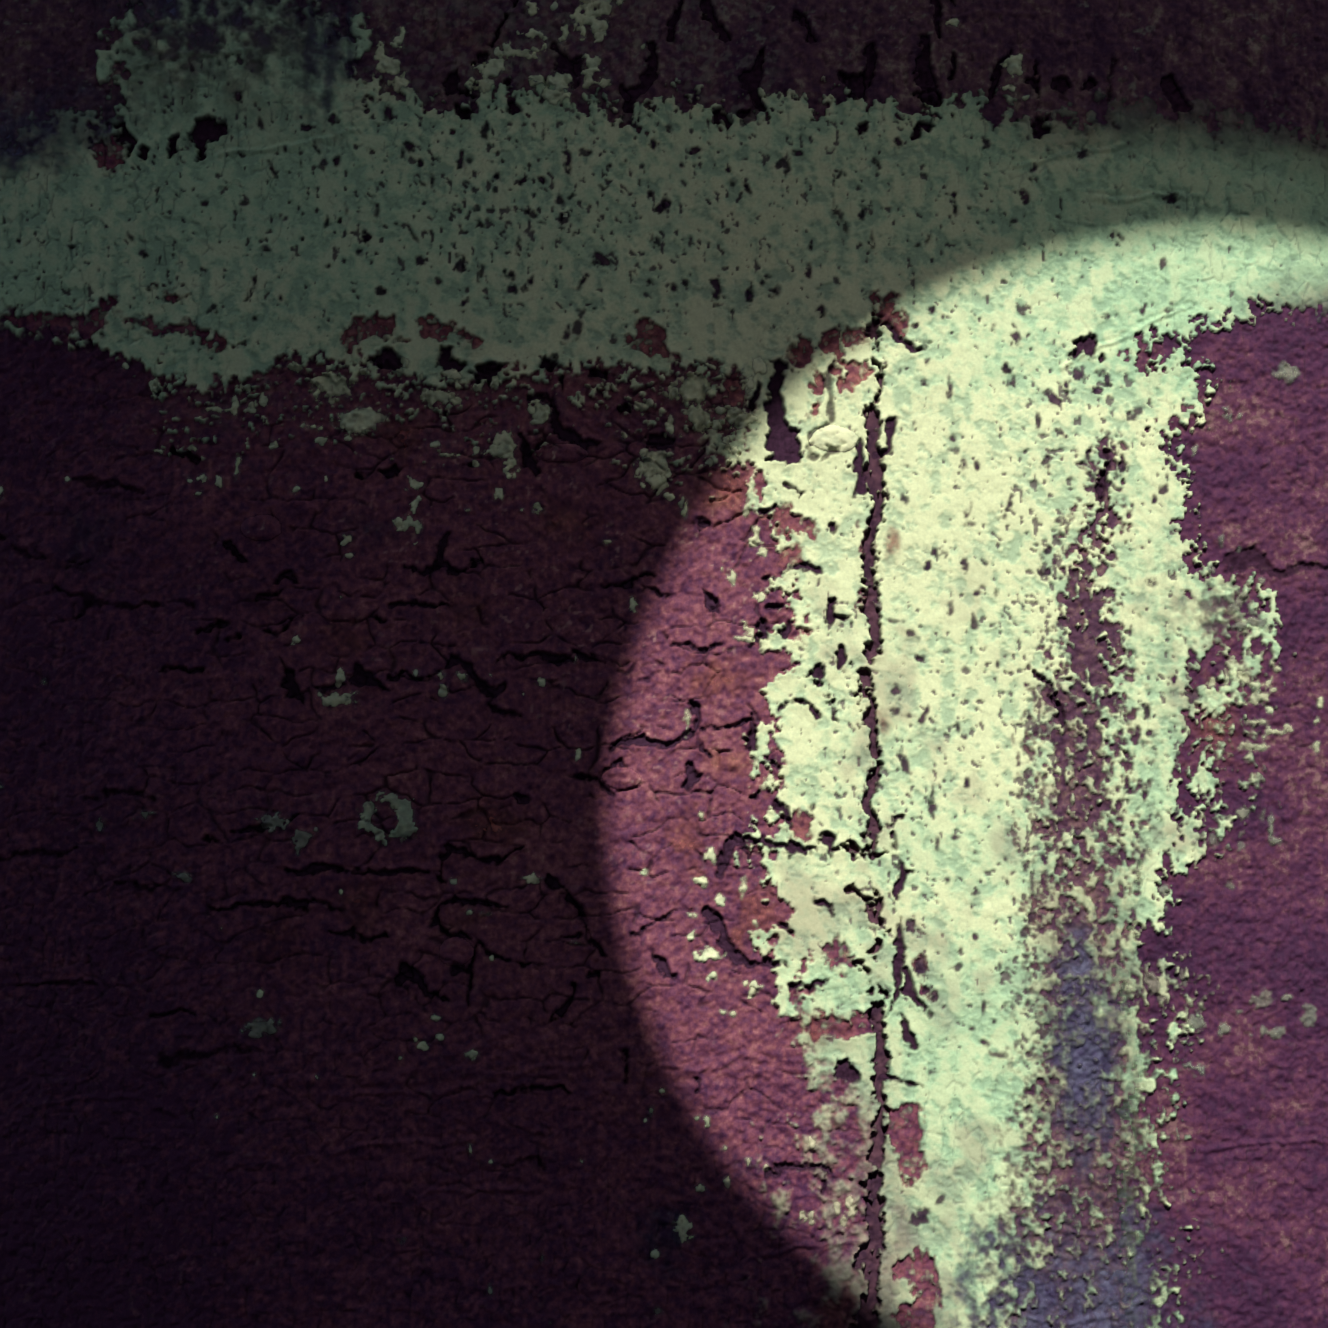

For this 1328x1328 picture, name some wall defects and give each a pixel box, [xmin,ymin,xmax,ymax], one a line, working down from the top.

peeling [0,0,1328,176]
spalling [610,290,918,532]
rust [704,468,746,508]
peeling [743,503,837,568]
crack [762,562,823,581]
spalling [807,645,847,721]
crack [574,699,821,796]
peeling [969,294,1328,1328]
crack [545,800,828,1022]
crack [814,899,834,917]
crack [878,815,933,1086]
peeling [891,1246,942,1328]